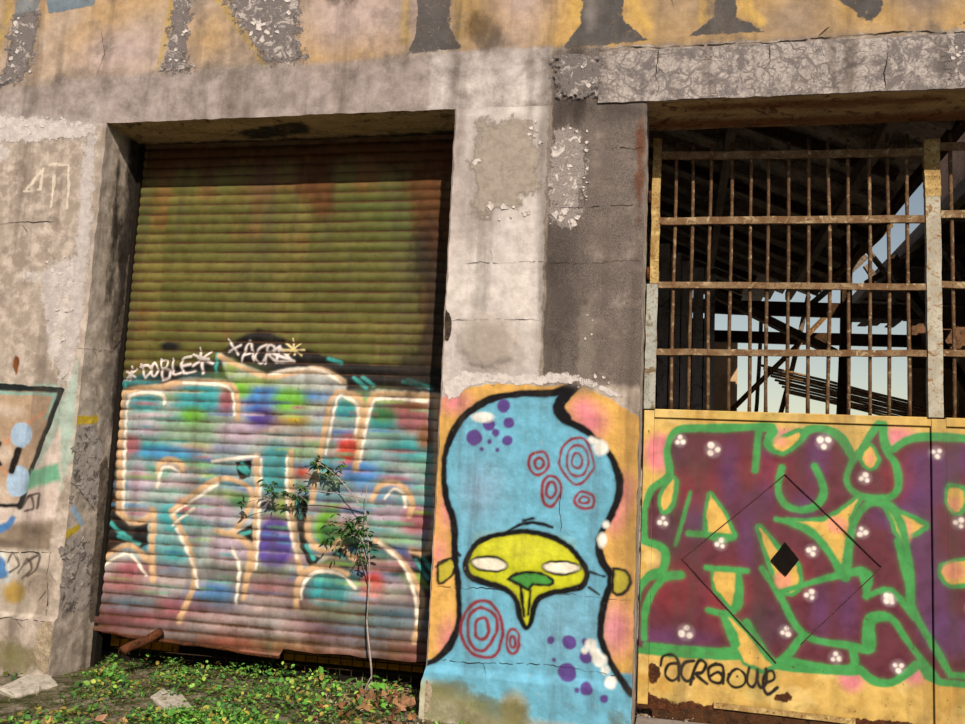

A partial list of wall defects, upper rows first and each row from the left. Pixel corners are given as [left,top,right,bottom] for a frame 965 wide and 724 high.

peeling [0,6,42,87]
peeling [157,0,196,75]
peeling [221,0,310,70]
crack [605,26,965,93]
peeling [466,114,590,231]
peeling [0,115,97,382]
damp [106,123,454,423]